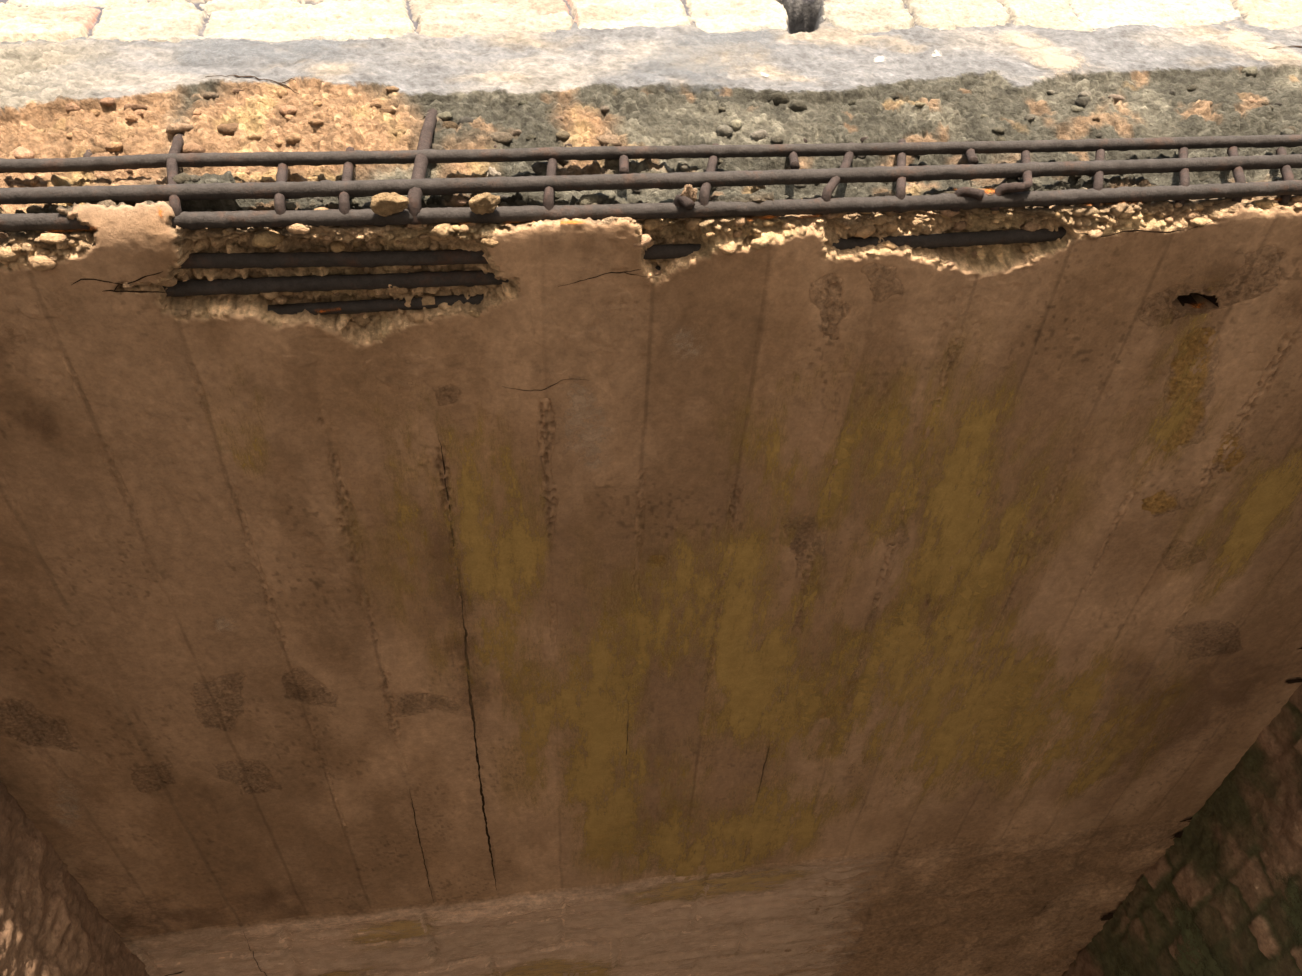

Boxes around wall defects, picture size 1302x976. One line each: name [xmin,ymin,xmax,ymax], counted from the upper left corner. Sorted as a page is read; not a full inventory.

crack [72,271,170,293]
spalling [0,64,1302,346]
crack [438,438,497,889]
water stain [386,371,1185,905]
water stain [1196,449,1302,596]
crack [409,788,434,902]